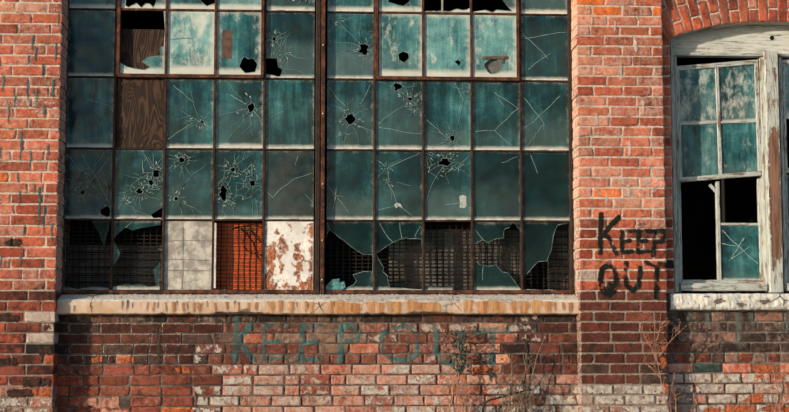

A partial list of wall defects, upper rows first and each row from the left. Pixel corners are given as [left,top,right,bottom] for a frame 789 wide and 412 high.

peeling [768,127,782,271]
corrosion [264,221,313,290]
peeling [411,324,477,332]
peeling [165,346,789,412]